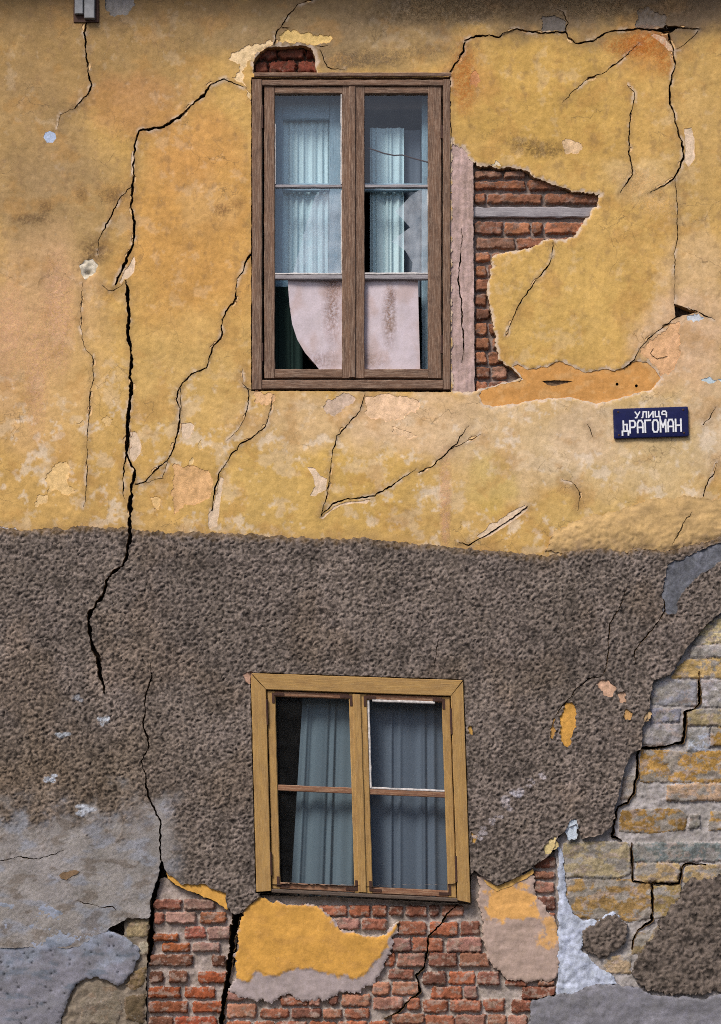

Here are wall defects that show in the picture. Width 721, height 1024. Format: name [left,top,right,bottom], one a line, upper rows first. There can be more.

crack [79,78,252,694]
crack [208,369,273,529]
flaking render [228,29,333,102]
crack [307,395,481,519]
flaking render [450,135,704,407]
crack [449,9,715,369]
flaking render [59,870,79,880]
crack [141,663,163,962]
crack [218,913,242,1024]
flaking render [61,872,596,1024]
flaking render [519,613,721,1000]
crack [611,671,705,950]